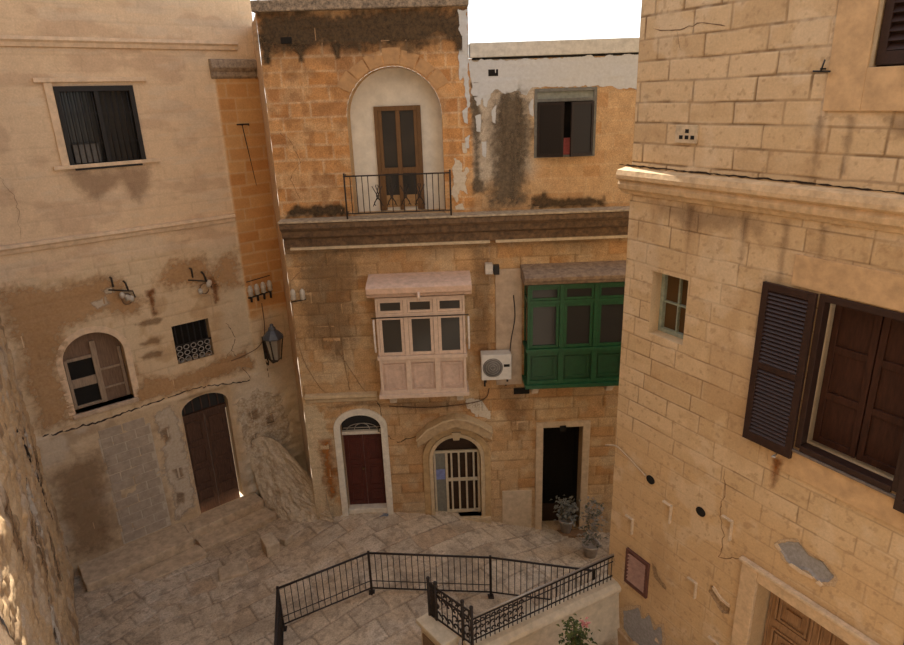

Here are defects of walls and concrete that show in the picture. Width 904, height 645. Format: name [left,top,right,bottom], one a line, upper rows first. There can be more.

leakage [257,7,466,64]
peeling [458,9,638,157]
leakage [470,82,605,209]
crack [718,471,739,559]
flaking render [774,538,838,587]
flaking render [619,605,667,645]
flaking render [709,586,730,614]